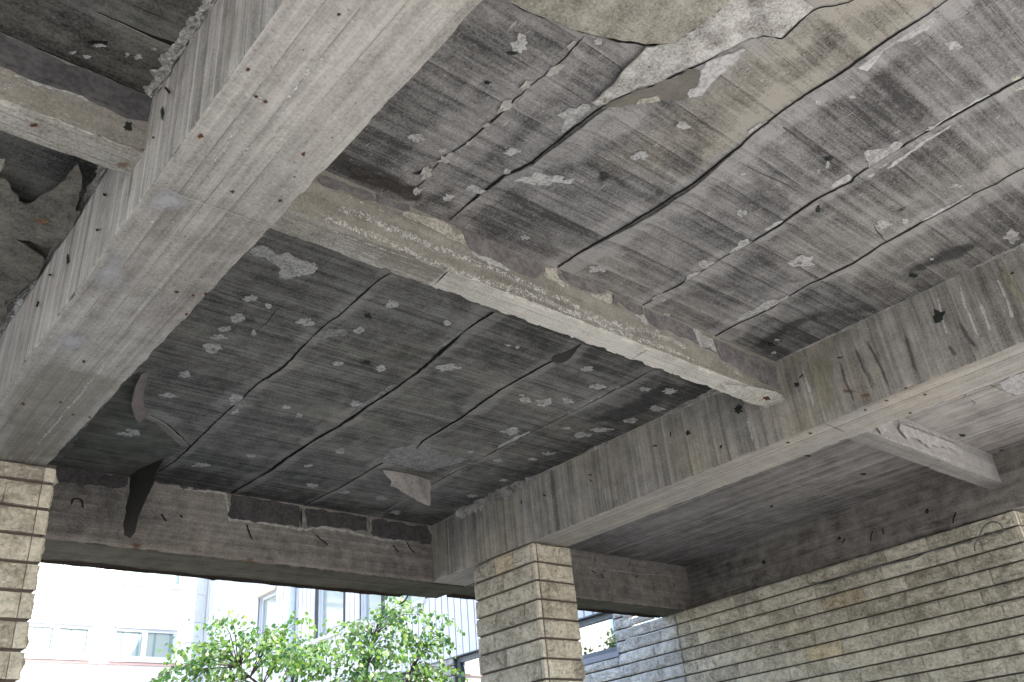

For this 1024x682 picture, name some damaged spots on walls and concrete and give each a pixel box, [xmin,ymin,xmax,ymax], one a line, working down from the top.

crack [410,3,658,195]
spalling [557,49,745,135]
crack [449,0,853,226]
crack [558,0,1024,314]
crack [145,273,399,473]
peeling [248,245,318,280]
peeling [295,318,365,345]
crack [230,312,504,495]
peeling [318,175,790,406]
peeling [519,384,620,414]
crack [713,168,1024,355]
peeling [228,495,432,544]